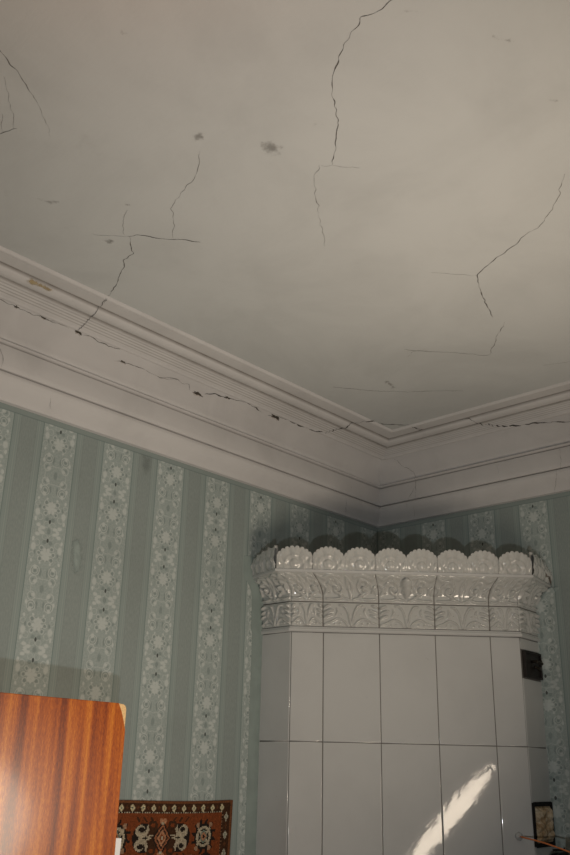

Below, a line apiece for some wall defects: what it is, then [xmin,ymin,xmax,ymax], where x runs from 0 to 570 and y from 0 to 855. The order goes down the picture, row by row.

crack [0,51,50,136]
crack [314,0,391,246]
crack [0,153,422,432]
crack [446,174,565,356]
crack [460,418,565,427]